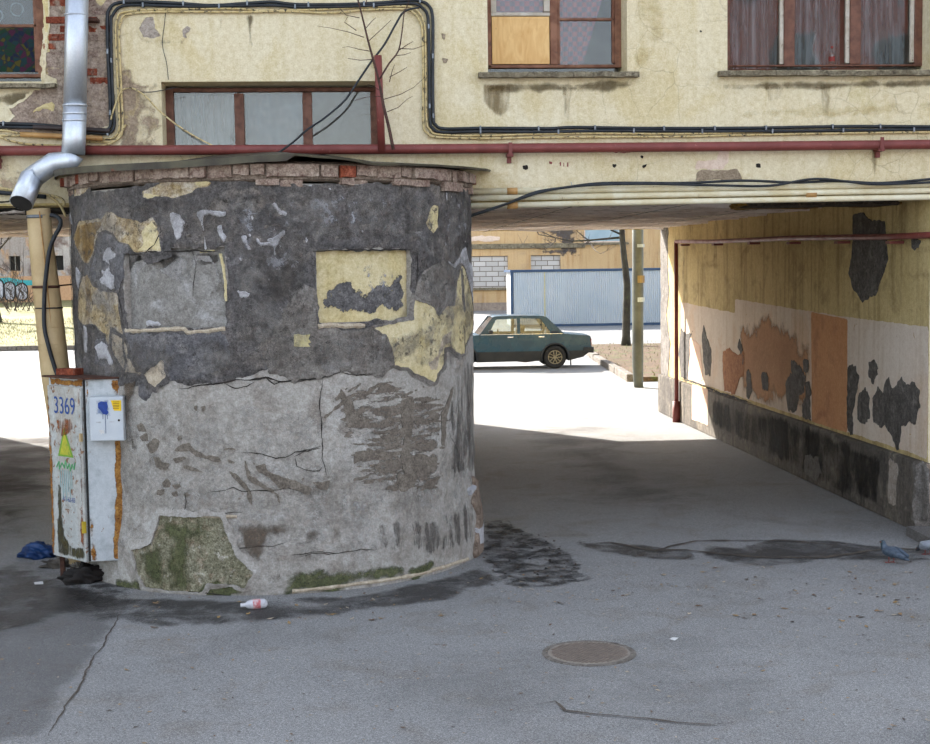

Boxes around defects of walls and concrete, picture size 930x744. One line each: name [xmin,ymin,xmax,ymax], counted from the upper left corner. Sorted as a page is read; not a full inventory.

peeling [4,0,65,144]
peeling [86,0,166,145]
peeling [72,181,220,393]
peeling [848,212,888,303]
spalling [124,423,264,595]
crack [172,369,368,514]
crack [239,543,379,558]
damp [321,367,475,492]
damp [413,502,472,553]
peeling [785,359,812,421]
peeling [846,359,921,506]